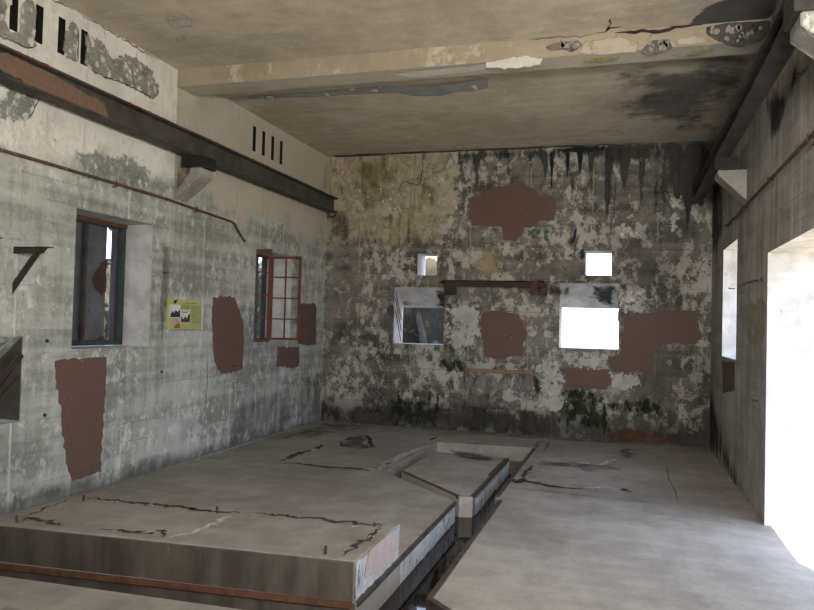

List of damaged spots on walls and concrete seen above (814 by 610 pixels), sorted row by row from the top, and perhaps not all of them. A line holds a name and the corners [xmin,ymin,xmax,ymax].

peeling [0,0,37,49]
peeling [63,21,159,99]
damp [394,55,543,78]
peeling [0,88,39,122]
damp [624,58,745,130]
damp [334,141,711,228]
peeling [666,193,684,232]
damp [712,181,722,252]
peeling [444,303,481,352]
peeling [535,351,642,412]
damp [321,402,399,426]
damp [448,404,560,437]